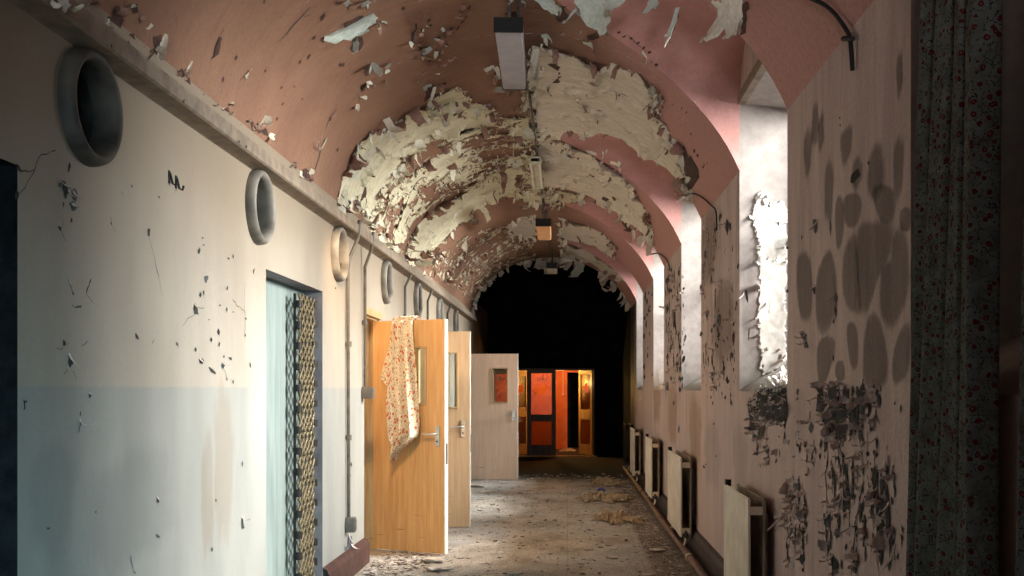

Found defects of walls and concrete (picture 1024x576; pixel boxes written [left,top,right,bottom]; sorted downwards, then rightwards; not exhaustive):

peeling [106,4,168,60]
peeling [313,0,387,67]
peeling [177,61,193,85]
peeling [247,115,278,142]
crack [15,150,71,200]
spalling [58,180,81,222]
peeling [290,161,315,182]
peeling [337,0,708,316]
peeling [643,262,686,406]
peeling [699,190,904,575]